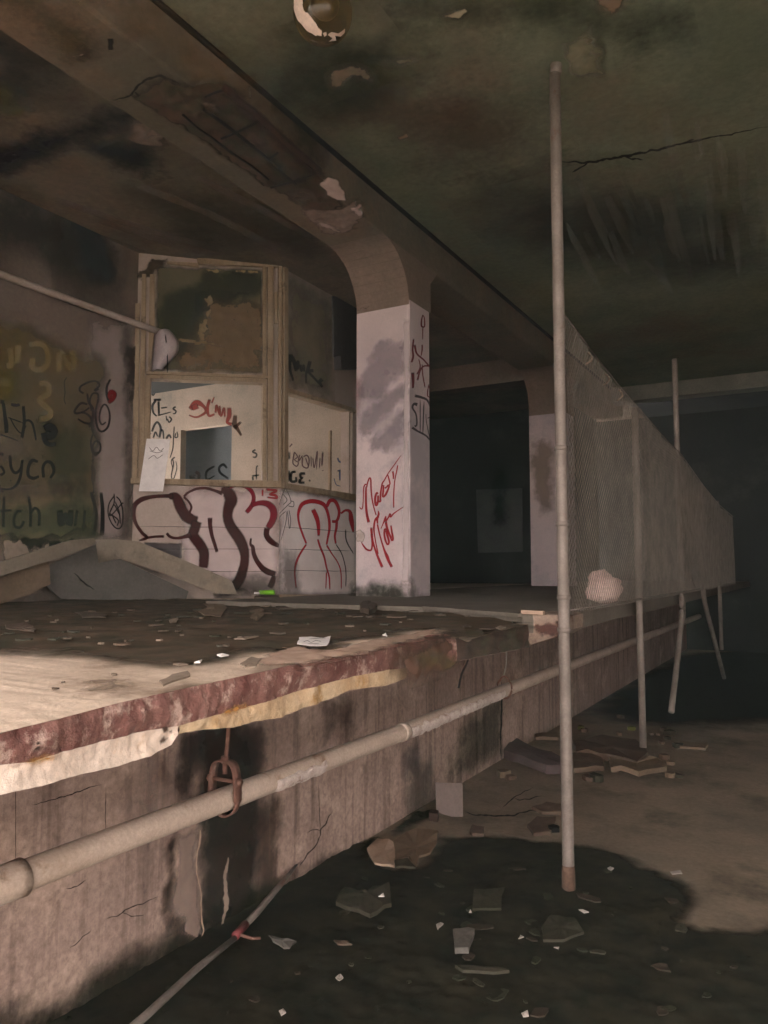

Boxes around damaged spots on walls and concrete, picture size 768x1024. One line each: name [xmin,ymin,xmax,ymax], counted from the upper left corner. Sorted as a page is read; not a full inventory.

crack [116,74,178,100]
peeling [330,66,371,88]
leakage [0,111,134,175]
crack [566,127,762,172]
peeling [302,177,363,234]
leakage [517,195,725,269]
spalling [0,669,406,795]
leakage [175,726,265,800]
crack [299,783,331,867]
leakage [0,799,280,1024]